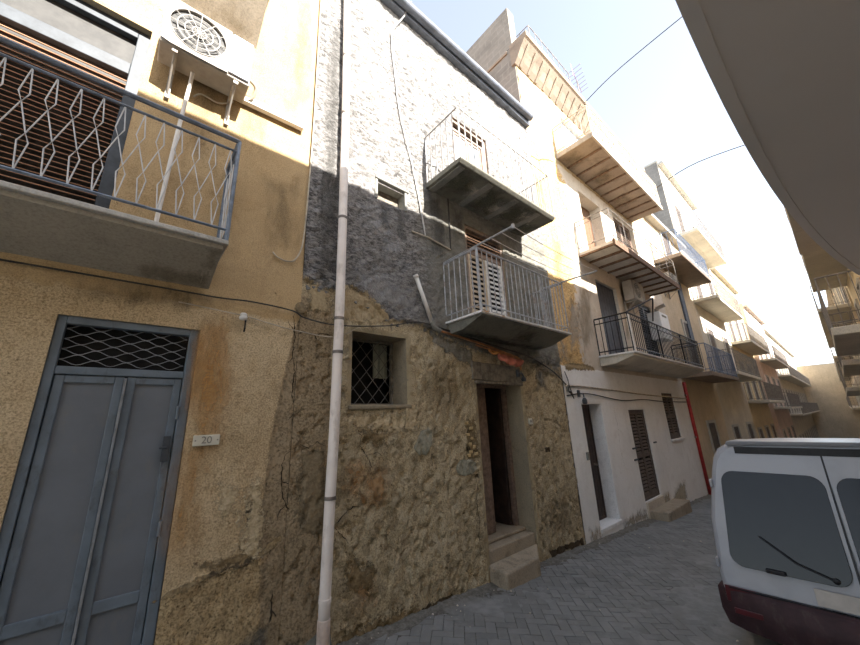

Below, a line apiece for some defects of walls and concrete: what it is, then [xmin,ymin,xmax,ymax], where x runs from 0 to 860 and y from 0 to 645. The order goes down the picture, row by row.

peeling [306,277,472,366]
spalling [563,363,595,371]
spalling [352,405,418,448]
spalling [465,419,480,459]
spalling [549,528,584,558]
spalling [343,555,377,602]
crack [268,591,276,623]
spalling [336,566,459,644]